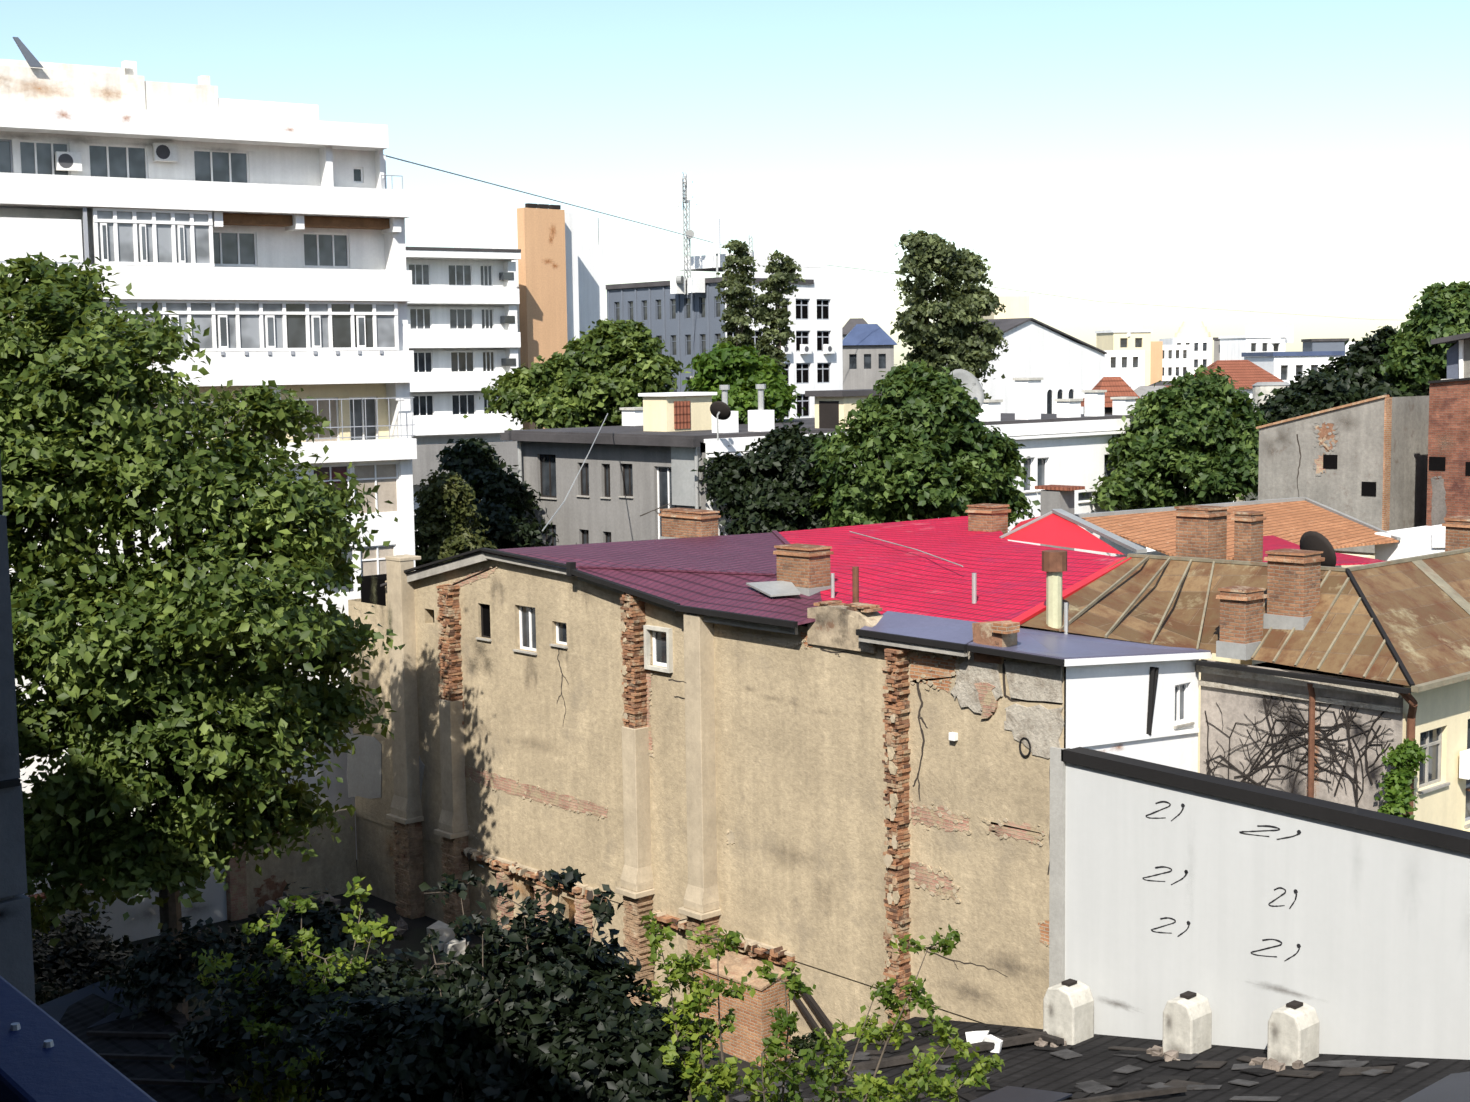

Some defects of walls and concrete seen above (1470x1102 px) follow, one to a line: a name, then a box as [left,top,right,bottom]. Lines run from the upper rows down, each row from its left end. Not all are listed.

flaking render [1313,421,1338,476]
crack [557,648,569,723]
spalling [620,589,654,758]
flaking render [465,765,608,820]
spalling [882,647,1045,1026]